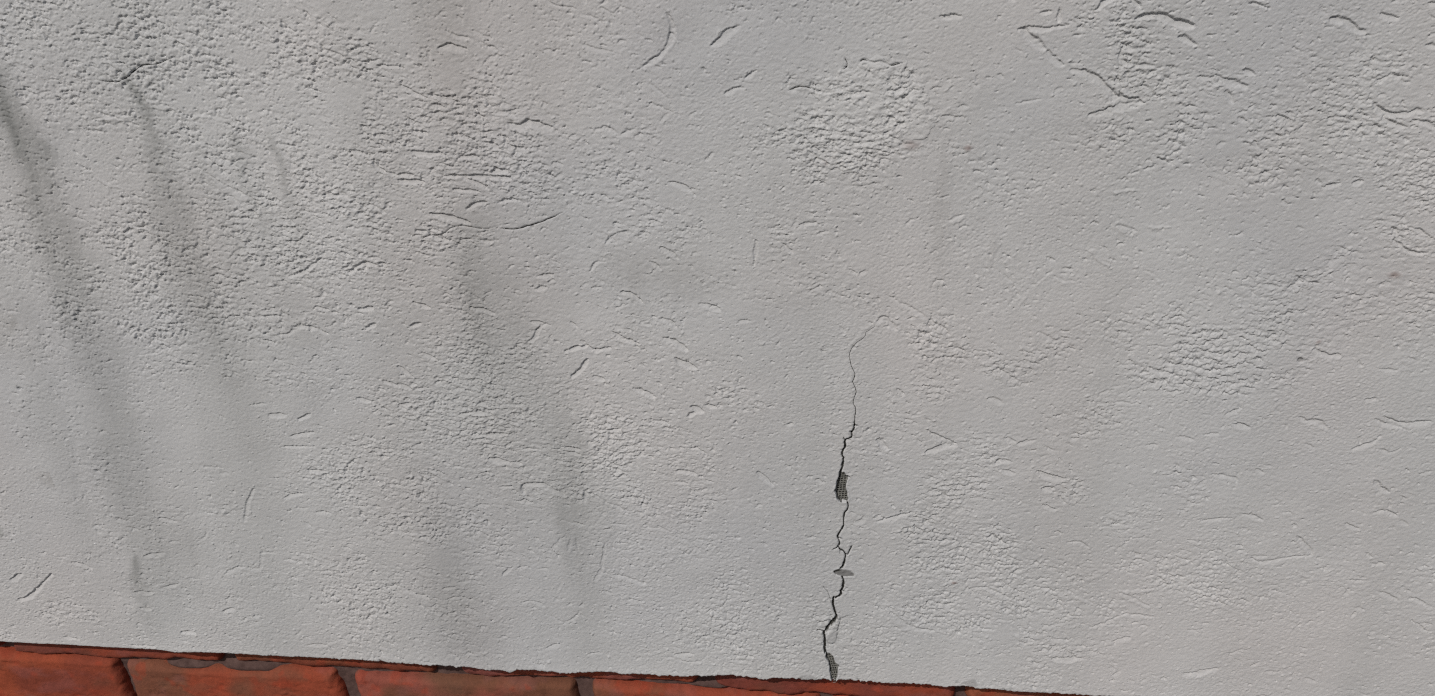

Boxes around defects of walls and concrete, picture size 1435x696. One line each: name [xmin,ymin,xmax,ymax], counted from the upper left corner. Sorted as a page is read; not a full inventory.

crack [818,330,869,653]